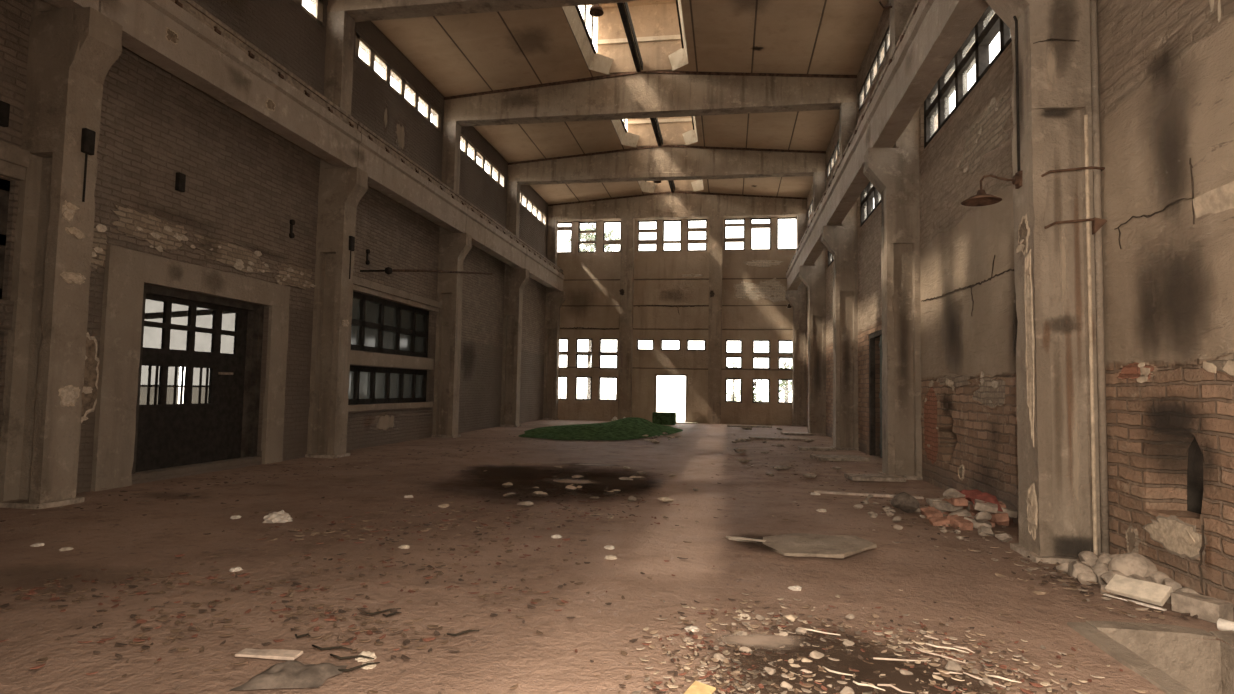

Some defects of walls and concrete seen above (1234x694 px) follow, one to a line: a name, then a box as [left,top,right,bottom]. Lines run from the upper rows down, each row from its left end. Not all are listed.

crack [1115,158,1195,249]
peeling [60,200,274,285]
crack [921,255,1014,316]
spalling [1203,351,1234,380]
spalling [921,380,940,469]
spalling [1125,515,1208,560]
crack [1197,525,1205,593]